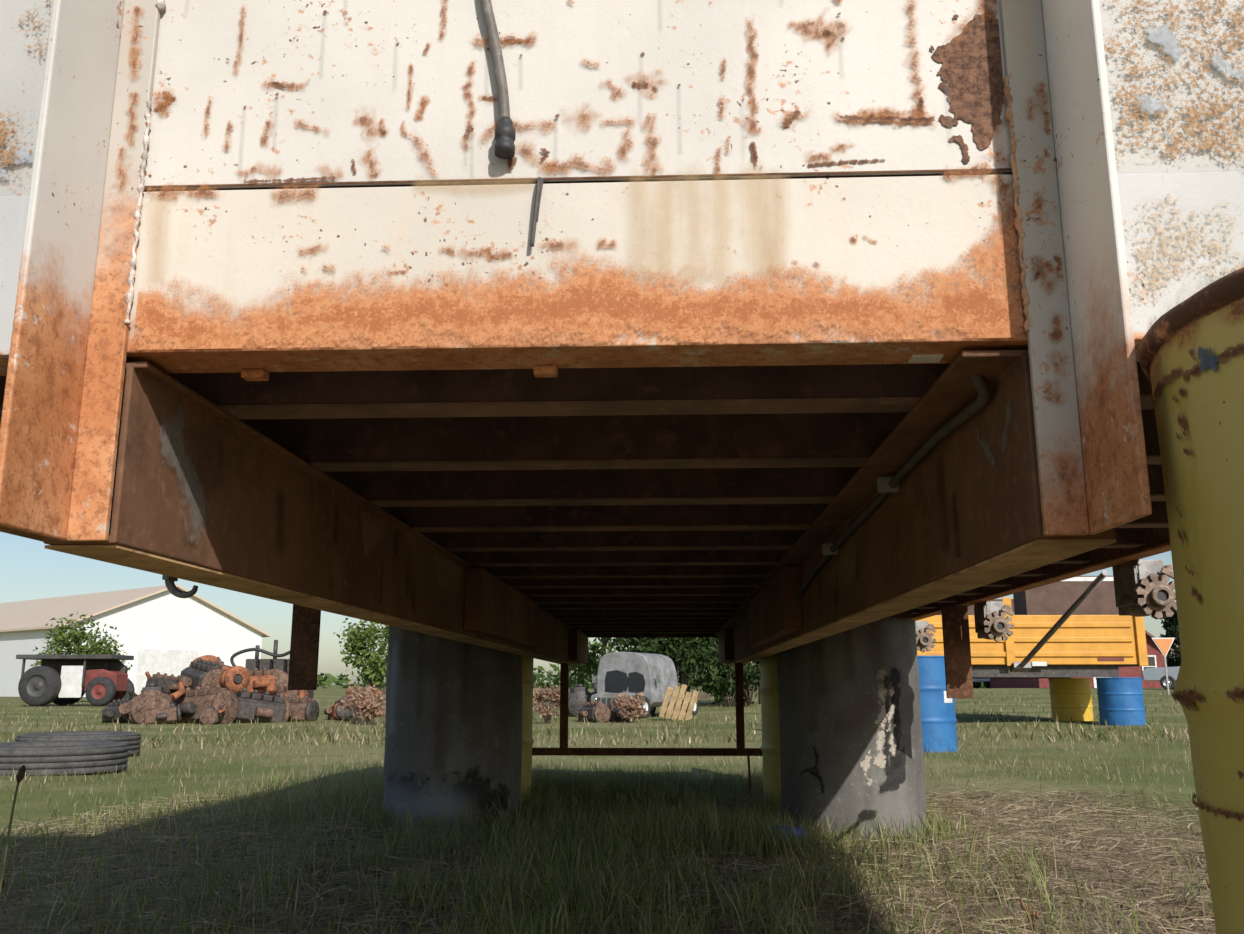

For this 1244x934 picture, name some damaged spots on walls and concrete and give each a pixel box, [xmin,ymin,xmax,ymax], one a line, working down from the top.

spalling [860,669,896,786]